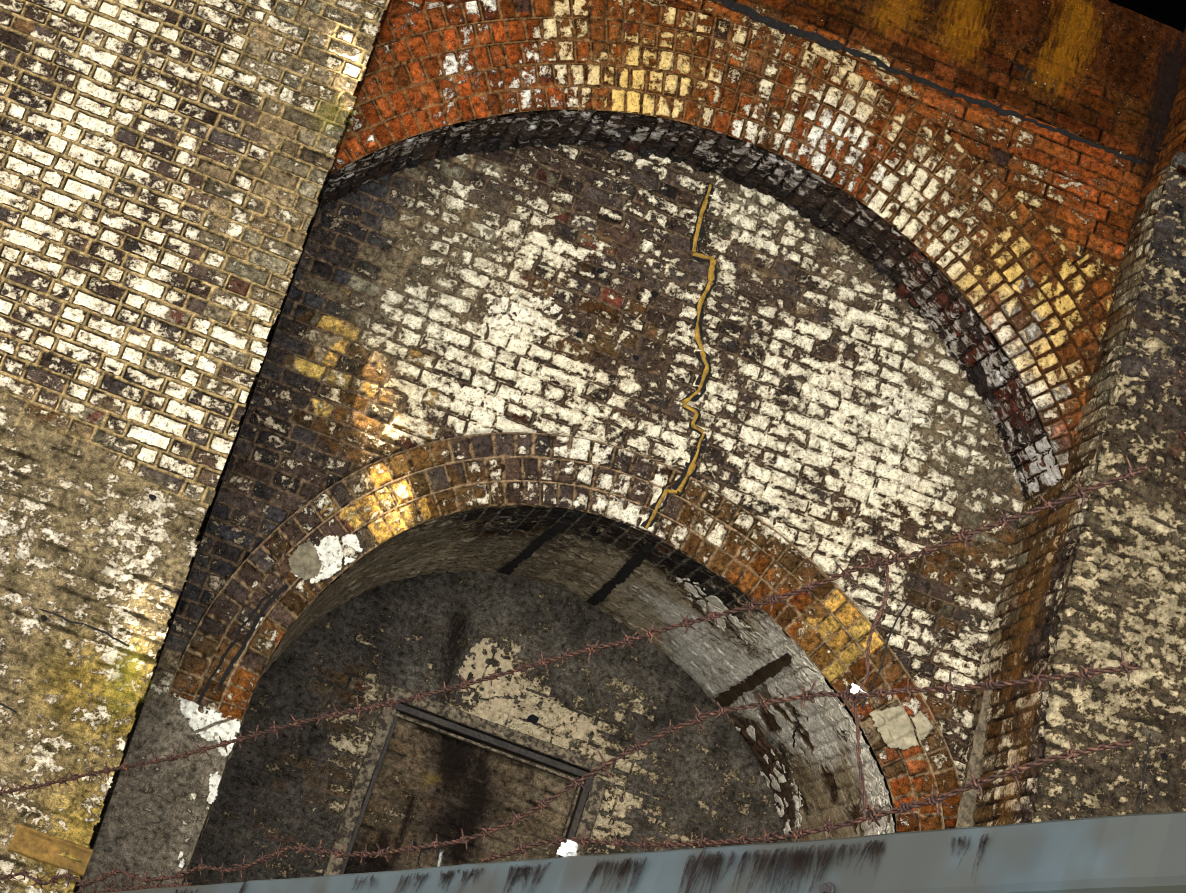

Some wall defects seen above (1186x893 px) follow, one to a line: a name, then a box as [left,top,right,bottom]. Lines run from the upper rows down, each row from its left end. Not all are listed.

crack [712,0,1143,165]
crack [586,183,717,606]
peeling [288,534,363,584]
peeling [166,687,241,757]
peeling [206,771,222,804]